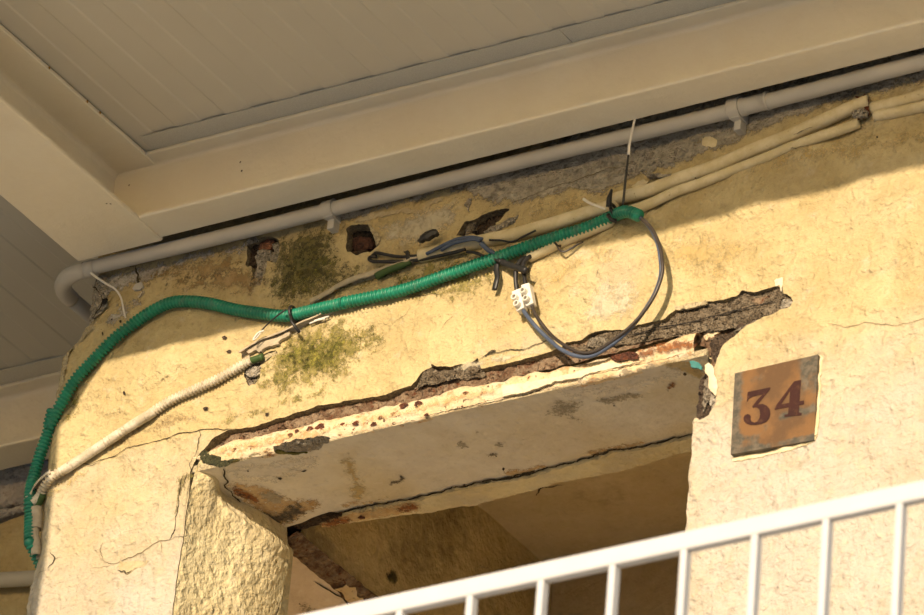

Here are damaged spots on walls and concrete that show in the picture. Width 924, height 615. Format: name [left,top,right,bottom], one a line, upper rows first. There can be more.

flaking render [547,48,924,147]
flaking render [341,70,924,255]
flaking render [56,236,280,401]
spalling [415,362,486,389]
spalling [548,277,793,420]
crack [83,428,227,568]
crack [223,469,241,503]
rust [228,484,321,525]
spalling [273,436,330,455]
rust [212,387,495,457]
crack [331,435,688,514]
peeling [335,585,364,603]